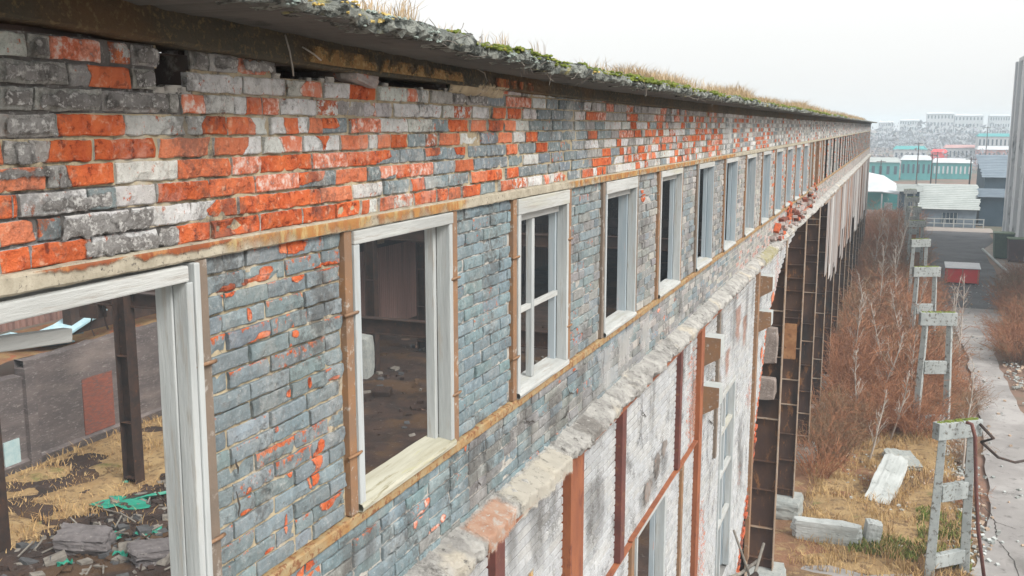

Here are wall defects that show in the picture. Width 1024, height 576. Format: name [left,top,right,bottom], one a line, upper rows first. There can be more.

flaking render [0,36,548,274]
corrosion [36,200,466,273]
spalling [769,183,818,251]
flaking render [217,266,273,298]
flaking render [307,439,325,489]
flaking render [320,489,342,510]
spalling [466,450,573,554]